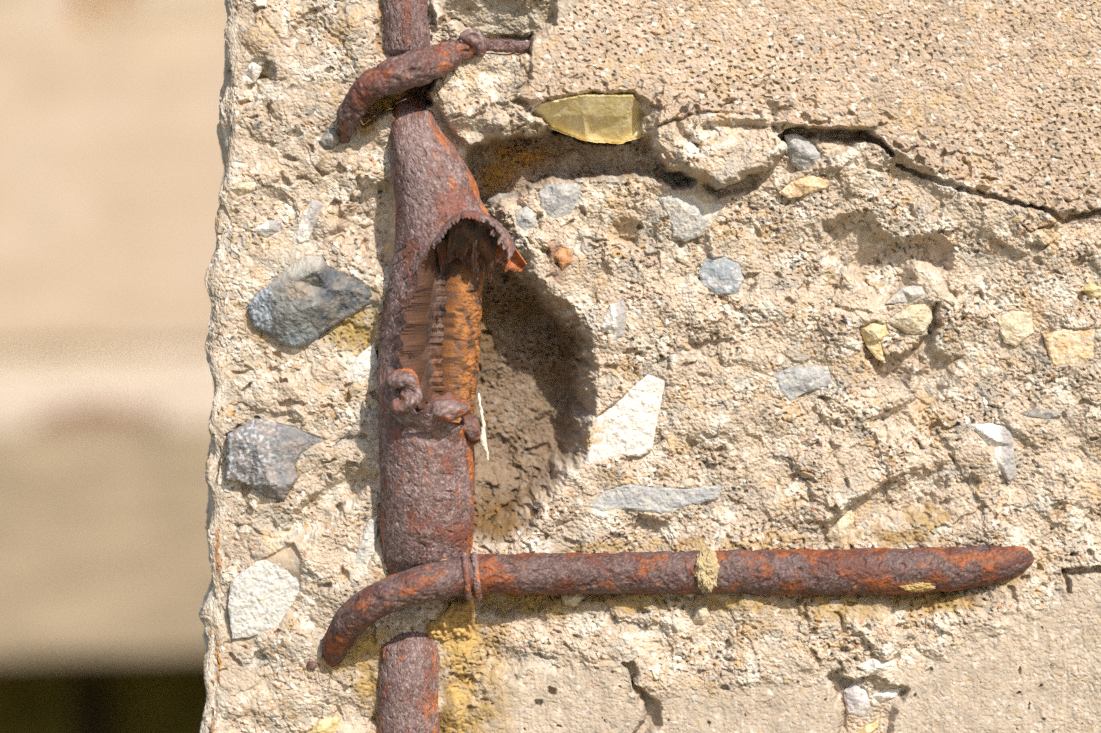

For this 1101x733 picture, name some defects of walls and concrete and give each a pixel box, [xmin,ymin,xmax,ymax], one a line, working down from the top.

crack [777,126,1101,235]
spalling [199,0,396,733]
corrosion [334,311,379,351]
corrosion [385,210,527,415]
spalling [394,0,1101,733]
corrosion [484,593,566,617]
corrosion [593,593,665,613]
corrosion [801,595,869,618]
corrosion [891,592,975,612]
crack [1061,565,1101,597]
corrosion [440,618,498,733]
crack [620,659,666,733]